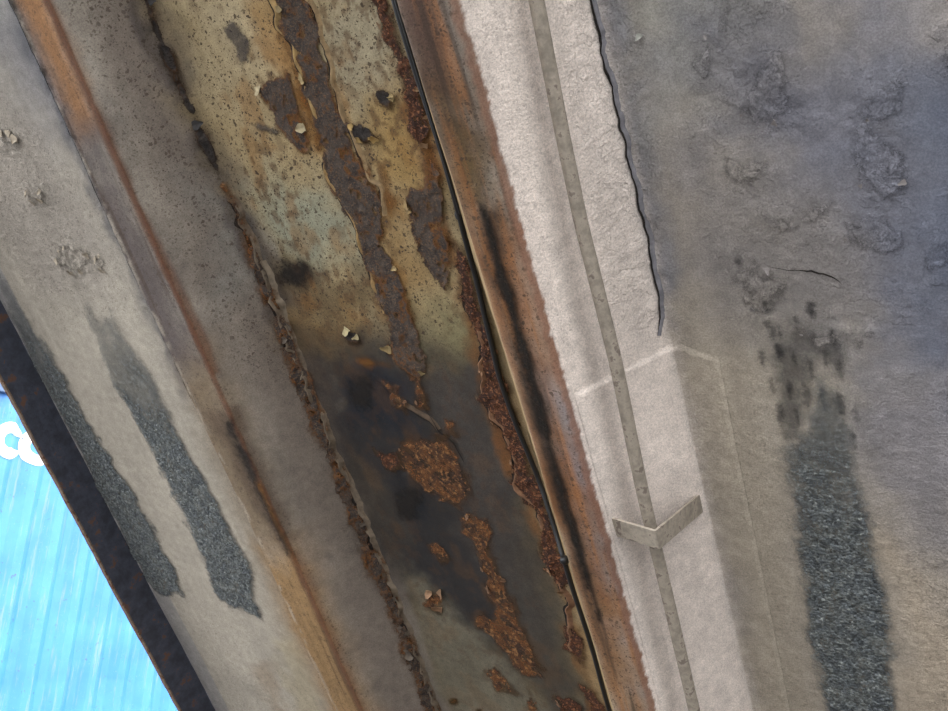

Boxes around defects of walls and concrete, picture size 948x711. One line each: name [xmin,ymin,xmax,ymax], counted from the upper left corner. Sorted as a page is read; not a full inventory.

corrosion [372,0,432,166]
crack [590,0,665,336]
corrosion [376,419,545,678]
corrosion [452,243,585,664]
corrosion [485,667,516,695]
corrosion [555,683,605,711]